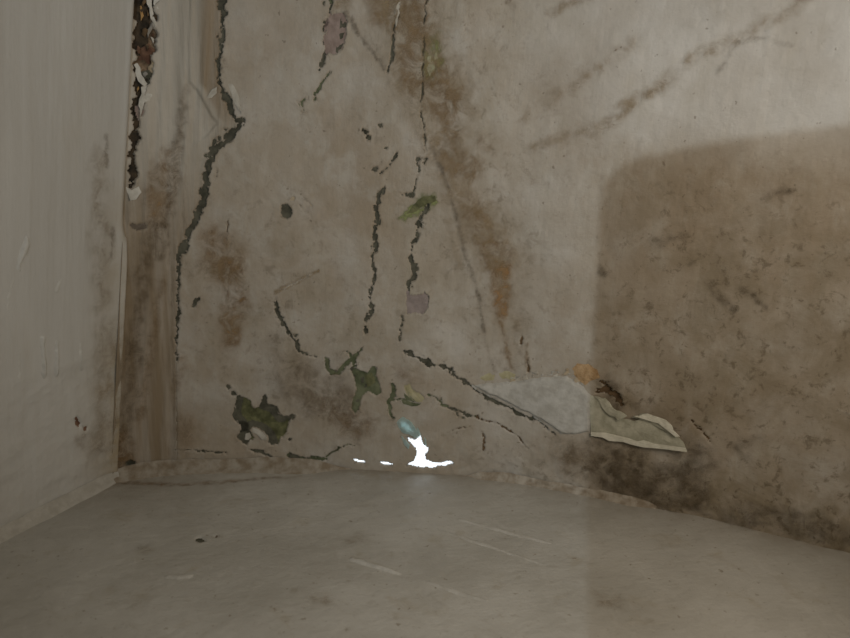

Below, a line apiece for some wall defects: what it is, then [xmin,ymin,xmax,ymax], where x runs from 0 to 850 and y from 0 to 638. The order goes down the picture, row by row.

spalling [126,0,157,201]
crack [298,0,347,111]
crack [174,0,245,361]
crack [357,0,555,451]
peeling [226,384,295,451]
crack [274,301,317,357]
peeling [324,351,381,413]
peeling [589,389,687,452]